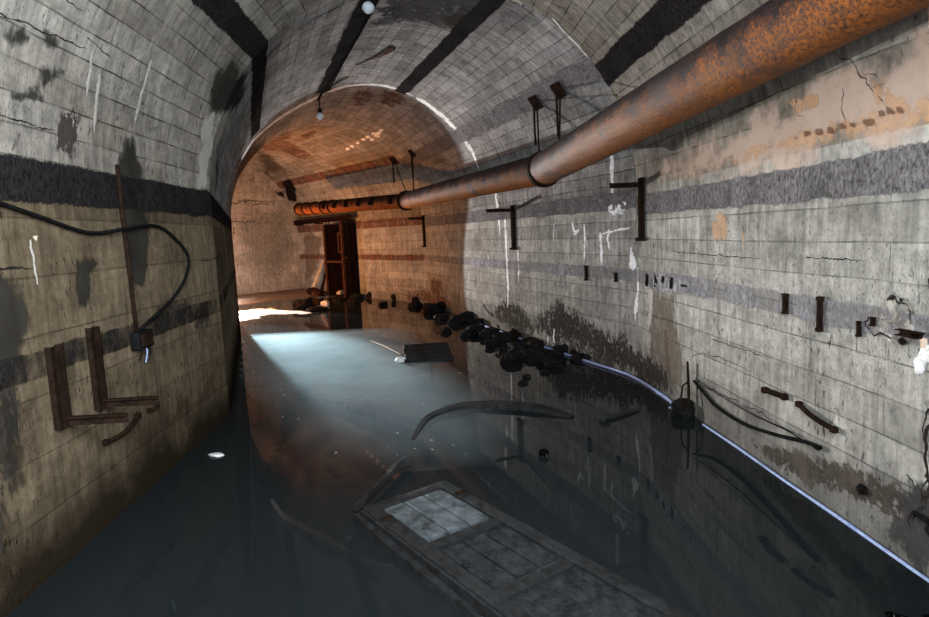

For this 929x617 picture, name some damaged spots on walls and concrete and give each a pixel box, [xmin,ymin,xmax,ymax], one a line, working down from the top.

water stain [6,29,29,43]
water stain [44,30,58,47]
water stain [12,69,59,102]
water stain [197,60,248,193]
spalling [795,107,903,139]
water stain [483,219,682,395]
crack [906,408,929,511]